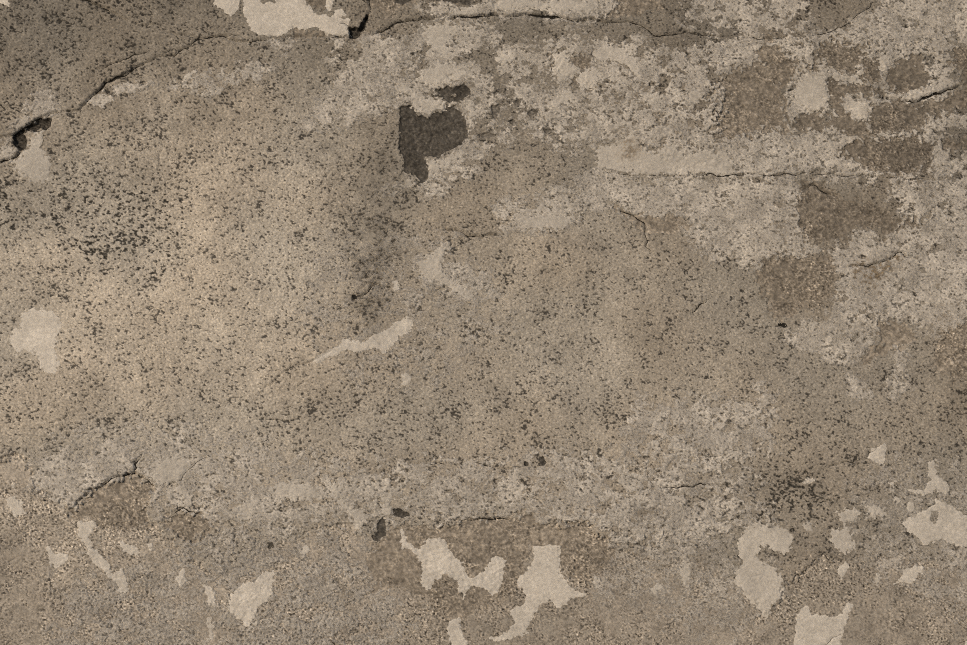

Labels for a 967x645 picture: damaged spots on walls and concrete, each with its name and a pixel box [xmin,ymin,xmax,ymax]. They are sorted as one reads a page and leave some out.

crack [0,0,265,163]
crack [319,0,713,38]
peeling [85,0,967,404]
peeling [9,307,64,374]
crack [79,452,213,501]
spalling [0,380,967,645]